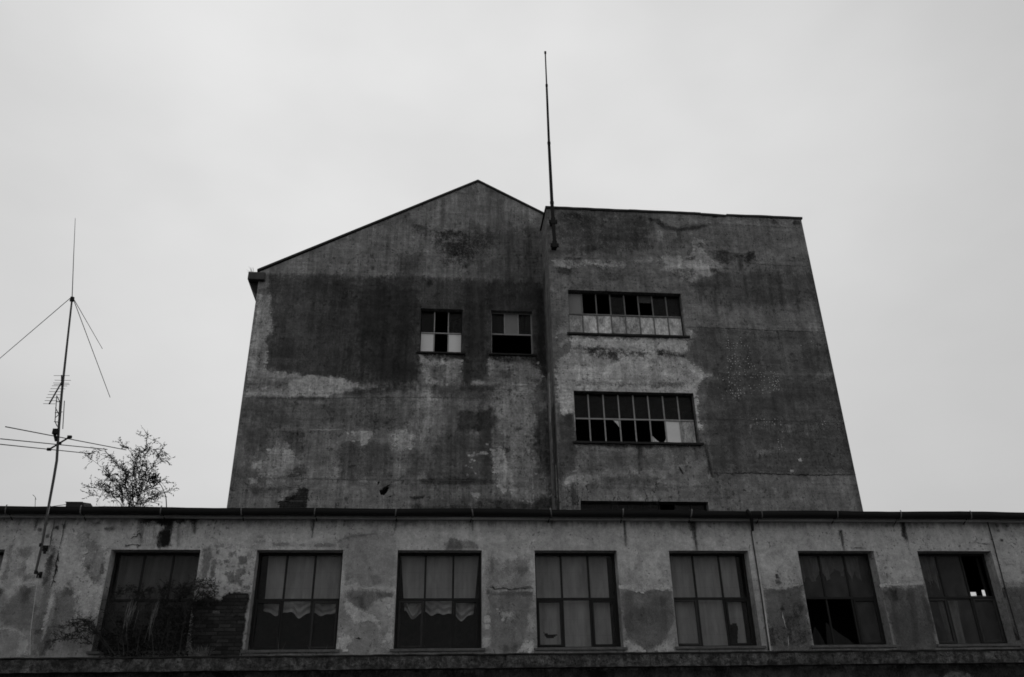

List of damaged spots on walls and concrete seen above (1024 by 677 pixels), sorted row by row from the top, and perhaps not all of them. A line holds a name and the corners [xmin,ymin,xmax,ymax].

flaking render [244,293,386,399]
flaking render [346,430,376,446]
flaking render [360,354,464,497]
flaking render [249,442,309,508]
water stain [139,518,200,547]
flaking render [190,540,284,656]
water stain [622,590,674,651]